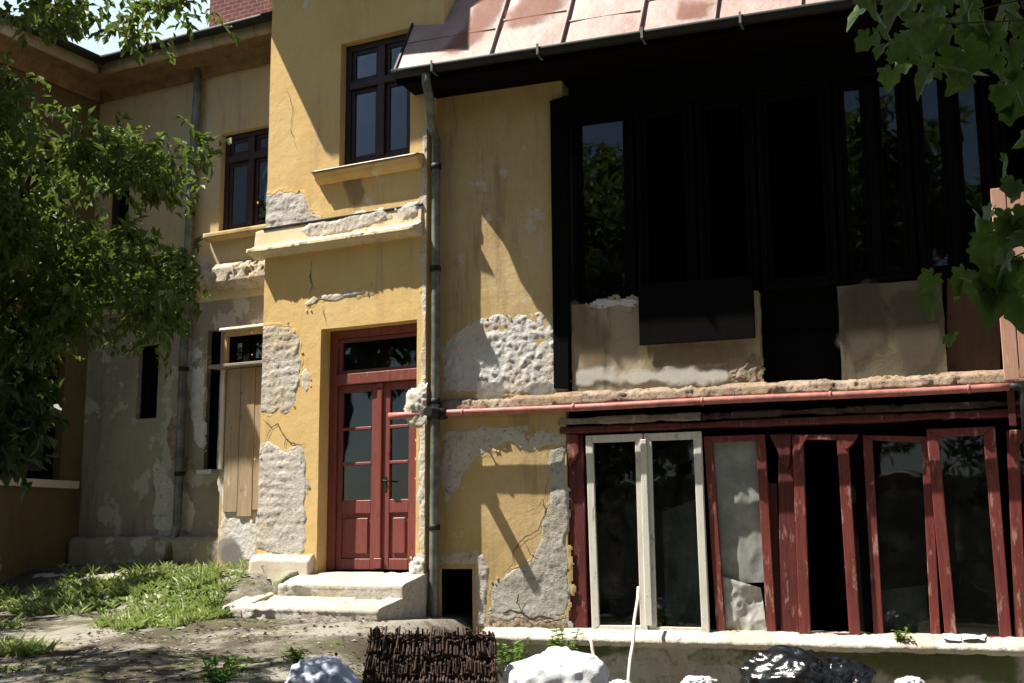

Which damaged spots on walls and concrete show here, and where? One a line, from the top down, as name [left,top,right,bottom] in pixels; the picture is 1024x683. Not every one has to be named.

flaking render [251,102,572,574]
peeling [585,294,639,315]
flaking render [723,350,765,385]
flaking render [151,347,208,532]
flaking render [217,441,310,566]
flaking render [438,422,576,629]
crack [506,479,549,571]